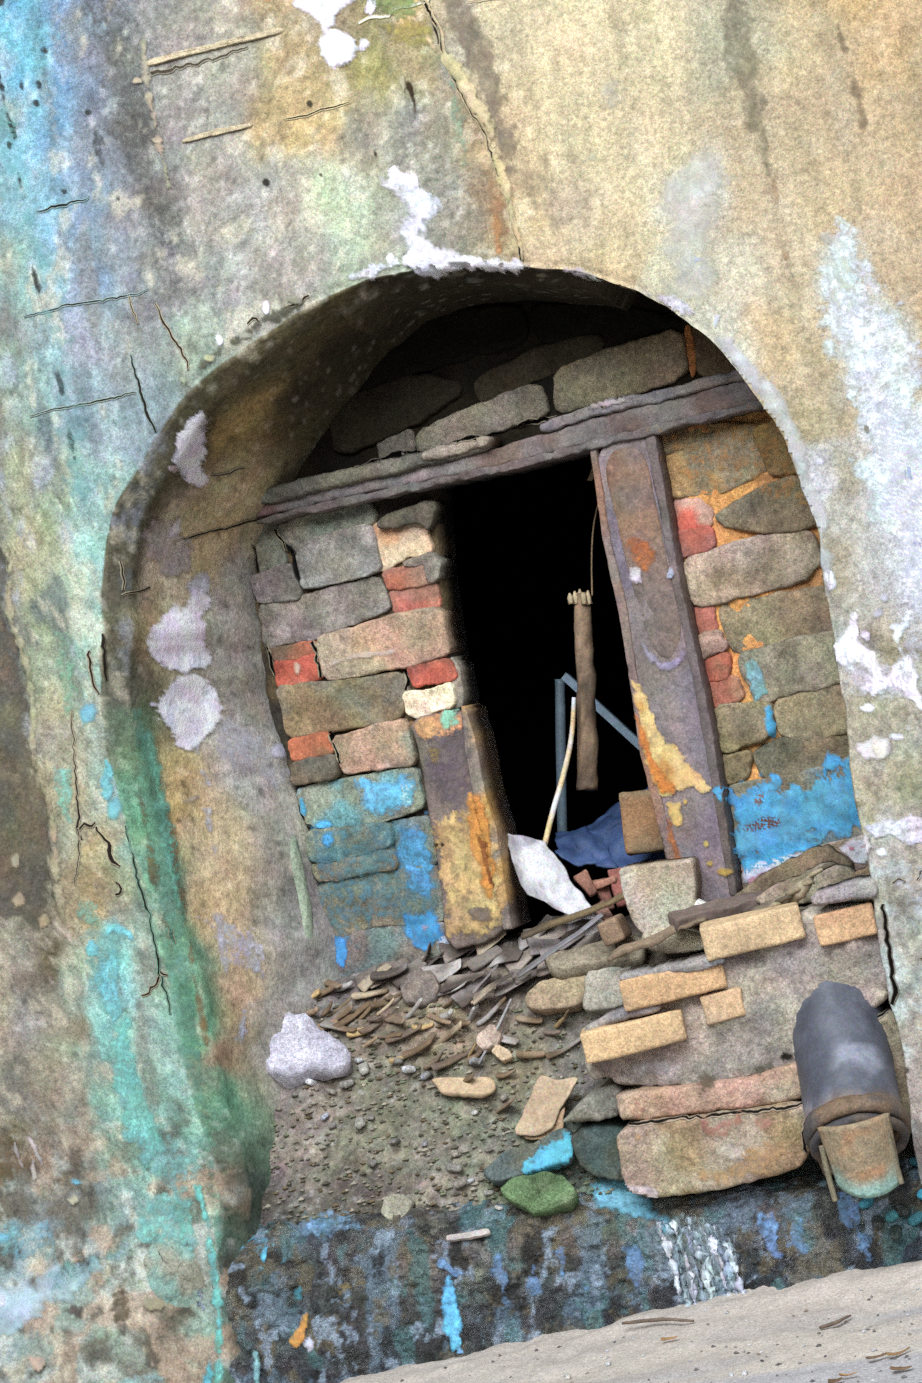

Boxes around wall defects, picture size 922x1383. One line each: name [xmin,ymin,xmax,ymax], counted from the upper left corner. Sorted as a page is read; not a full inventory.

damp [292,0,432,69]
crack [284,101,351,121]
crack [358,0,523,260]
damp [350,166,524,279]
damp [564,267,600,281]
crack [24,289,189,432]
damp [818,217,922,712]
crack [118,561,151,597]
crack [70,633,176,1014]